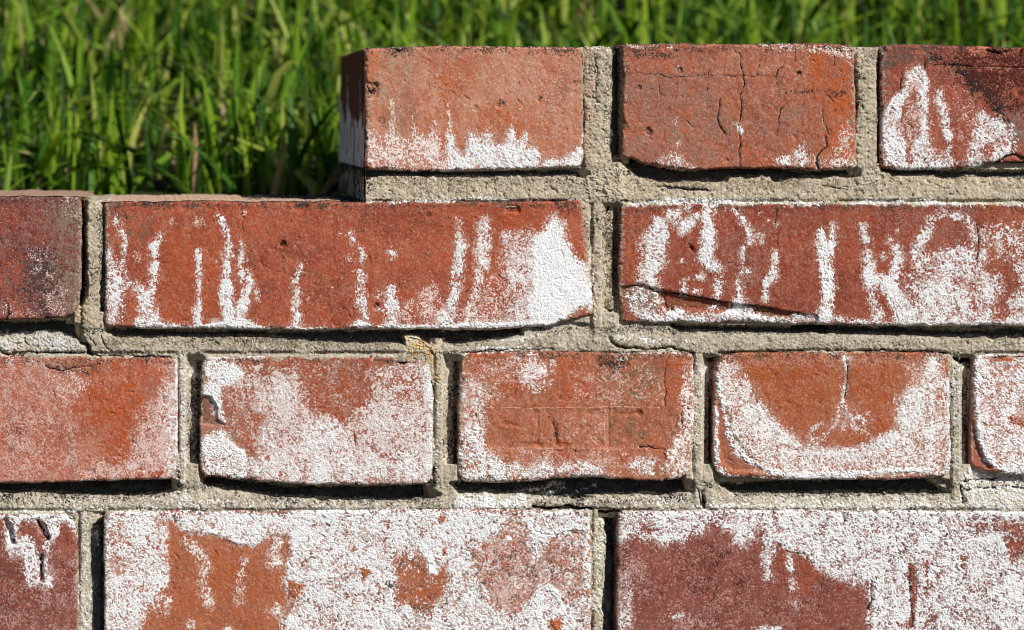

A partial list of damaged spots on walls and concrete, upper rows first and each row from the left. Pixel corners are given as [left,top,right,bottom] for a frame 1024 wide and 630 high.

efflorescence [339,46,615,173]
crack [645,48,848,190]
leakage [878,45,1024,171]
crack [626,285,804,315]
leakage [0,180,1024,630]
crack [767,349,1024,401]